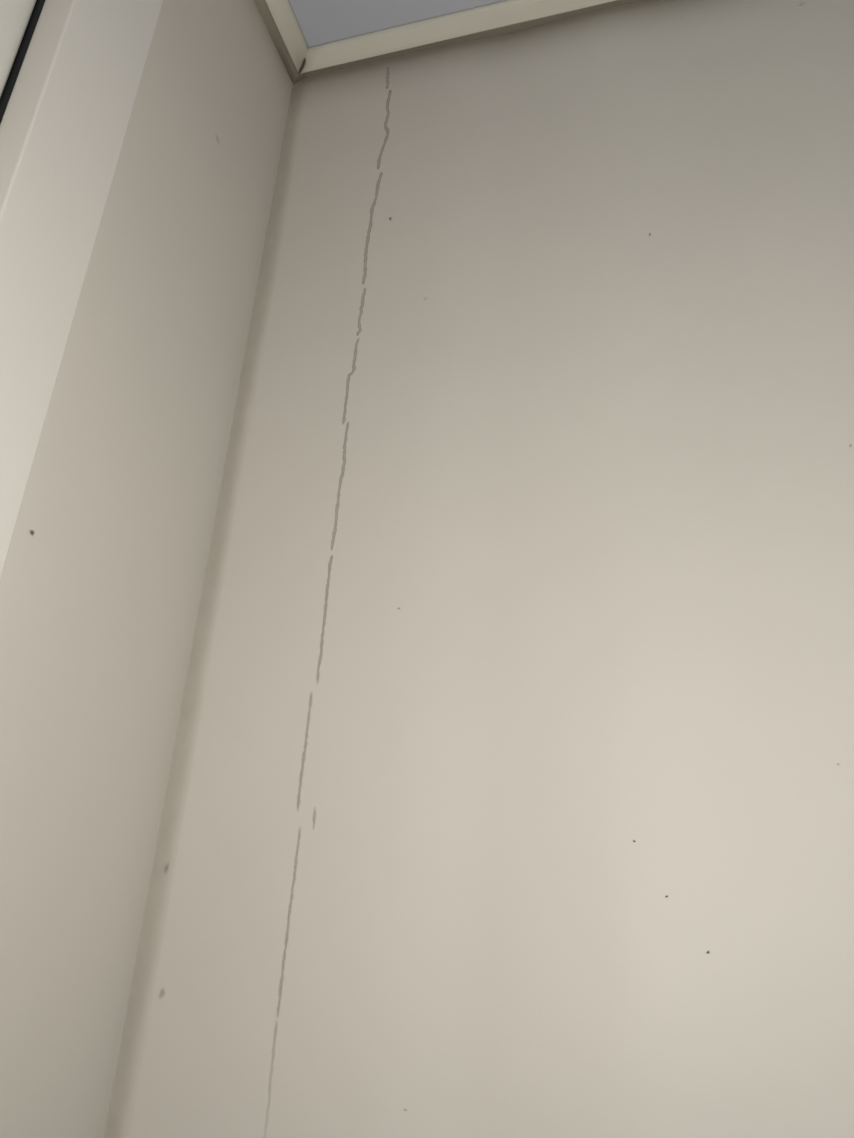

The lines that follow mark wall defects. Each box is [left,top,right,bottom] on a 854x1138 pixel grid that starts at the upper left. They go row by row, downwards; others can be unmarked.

crack [317,68,391,679]
crack [297,711,310,807]